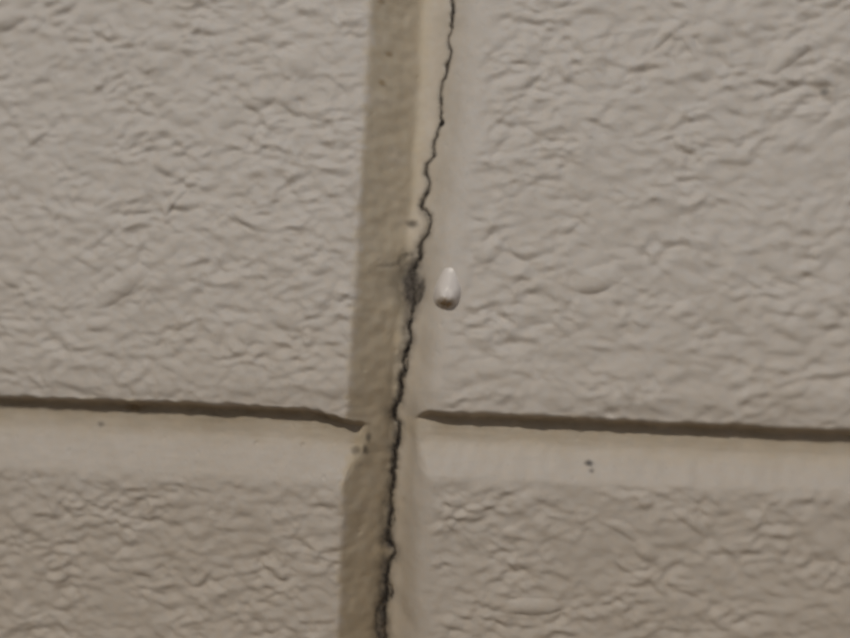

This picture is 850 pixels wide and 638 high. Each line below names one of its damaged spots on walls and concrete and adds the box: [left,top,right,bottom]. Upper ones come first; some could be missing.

crack [448,0,456,29]
crack [413,50,452,271]
crack [376,295,422,638]